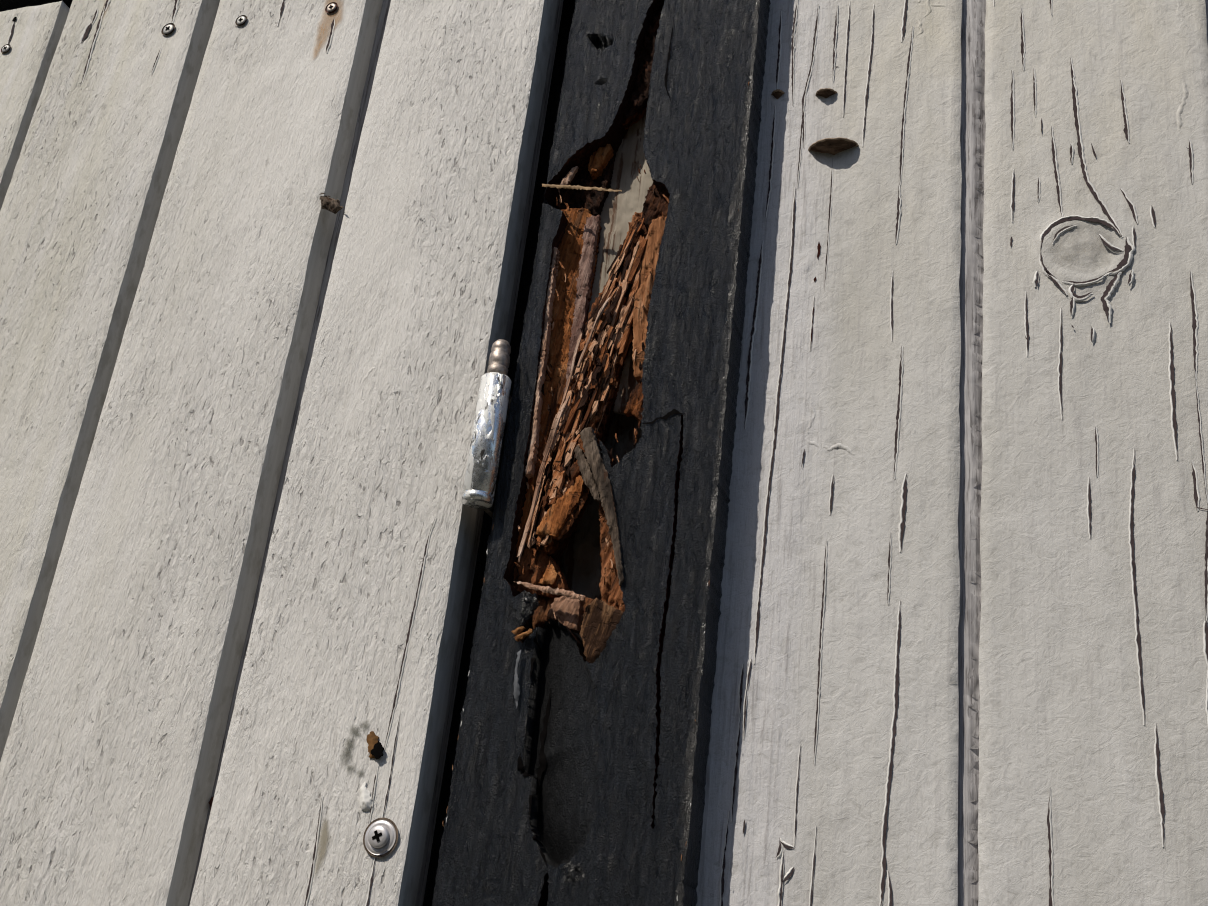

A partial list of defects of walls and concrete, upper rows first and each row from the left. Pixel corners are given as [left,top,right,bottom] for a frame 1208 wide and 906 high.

spalling [511,10,670,709]
crack [643,409,684,764]
crack [993,0,1156,419]
crack [1087,426,1099,539]
crack [1128,449,1165,847]
crack [1168,271,1208,725]
crack [1186,139,1194,184]